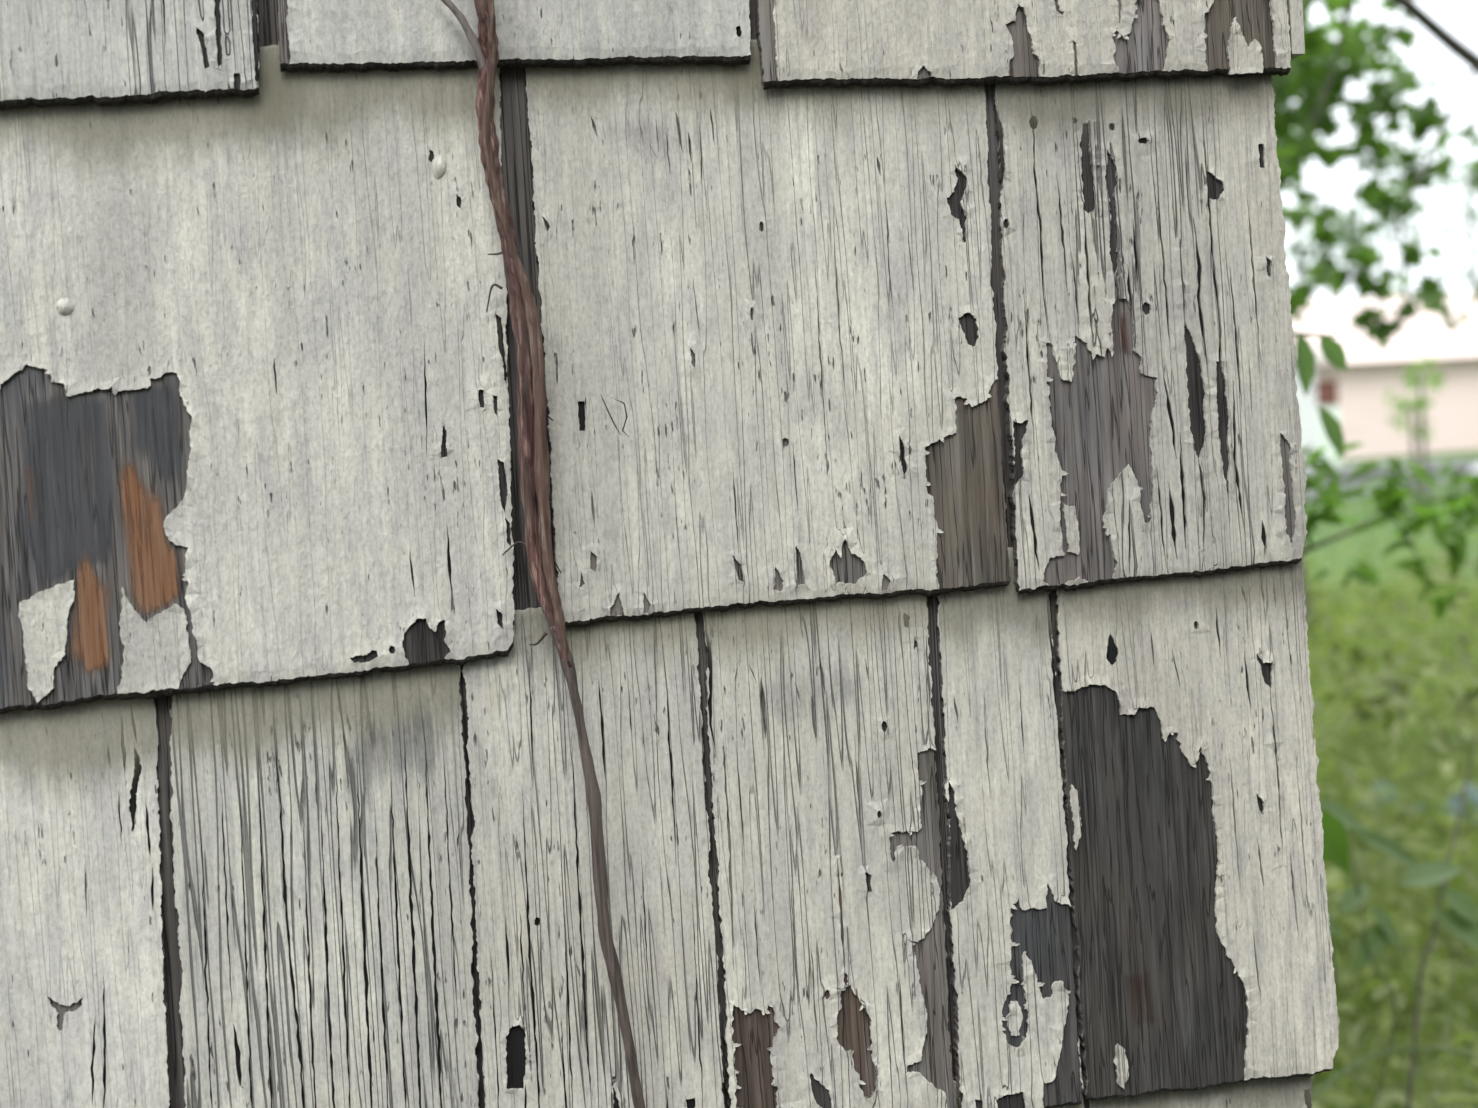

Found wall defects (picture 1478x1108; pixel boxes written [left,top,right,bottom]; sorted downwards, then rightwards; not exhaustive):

peeling [1006,6,1039,77]
peeling [1112,0,1169,74]
peeling [1204,0,1275,75]
peeling [947,168,967,242]
peeling [958,313,978,347]
peeling [1043,118,1157,586]
peeling [0,365,215,709]
peeling [925,380,1028,589]
peeling [889,684,1248,1108]
peeling [824,866,878,1099]
peeling [732,1002,780,1108]
peeling [810,1073,831,1108]